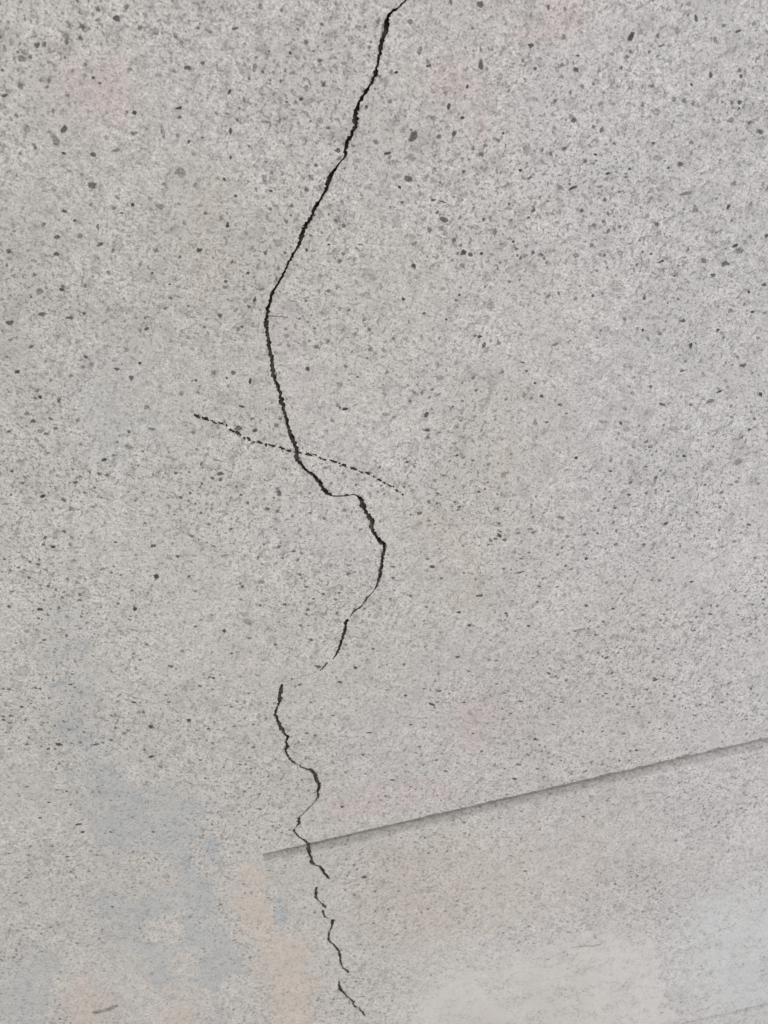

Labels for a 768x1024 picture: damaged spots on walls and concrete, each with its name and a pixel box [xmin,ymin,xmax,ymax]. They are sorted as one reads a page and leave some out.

crack [194,0,407,1016]